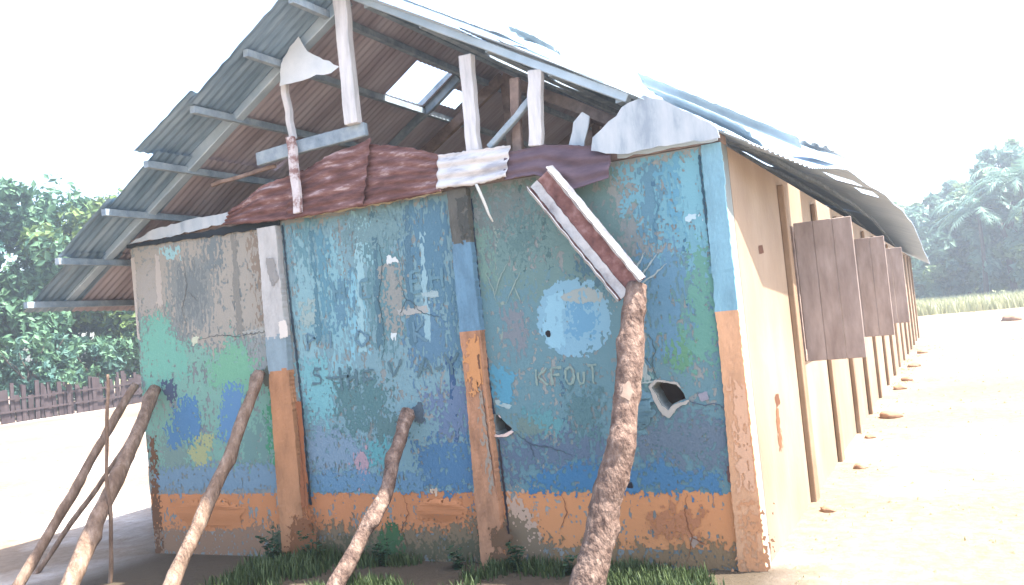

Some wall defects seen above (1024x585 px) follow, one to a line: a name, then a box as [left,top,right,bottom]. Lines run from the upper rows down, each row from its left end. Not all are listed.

crack [182,258,265,340]
rust [223,138,441,225]
peeling [130,177,624,559]
crack [471,199,572,549]
rust [503,145,611,189]
peeling [574,148,755,495]